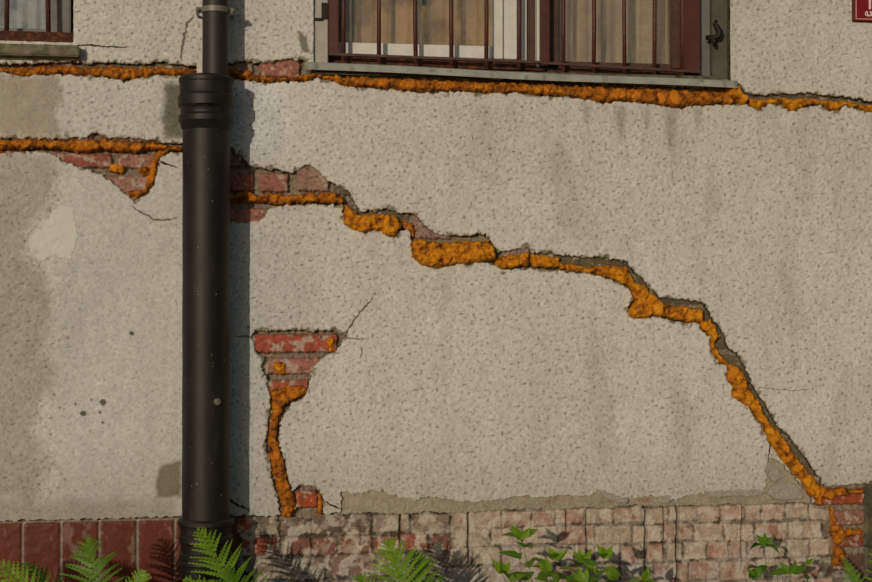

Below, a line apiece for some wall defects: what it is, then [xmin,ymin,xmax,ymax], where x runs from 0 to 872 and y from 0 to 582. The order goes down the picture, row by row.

flaking render [0,134,182,221]
crack [228,59,872,113]
crack [230,148,821,504]
flaking render [233,296,865,571]